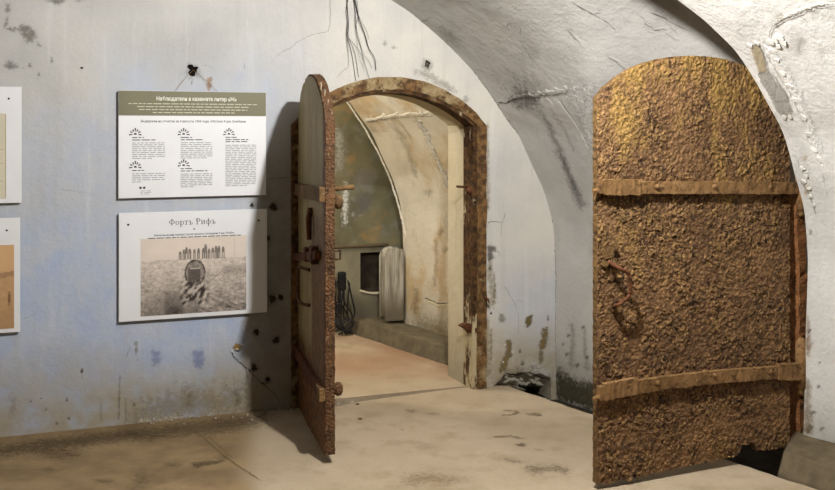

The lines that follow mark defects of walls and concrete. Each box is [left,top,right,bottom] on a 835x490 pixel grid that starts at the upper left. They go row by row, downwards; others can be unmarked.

peeling [539,328,548,351]
spalling [499,340,550,391]
damp [556,371,593,411]